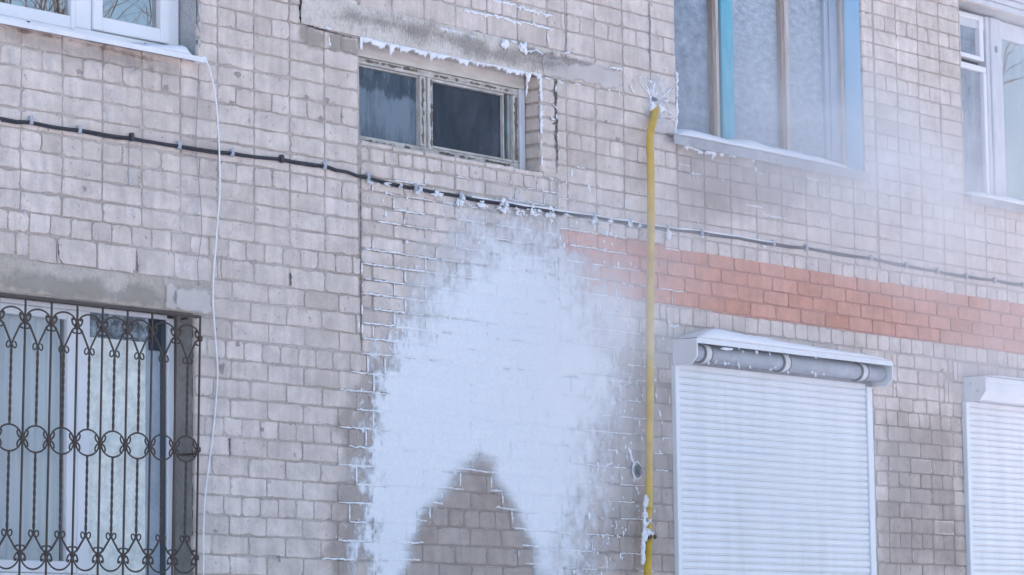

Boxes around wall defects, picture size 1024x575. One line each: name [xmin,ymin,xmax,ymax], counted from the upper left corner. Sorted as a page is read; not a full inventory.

crack [553,0,567,166]